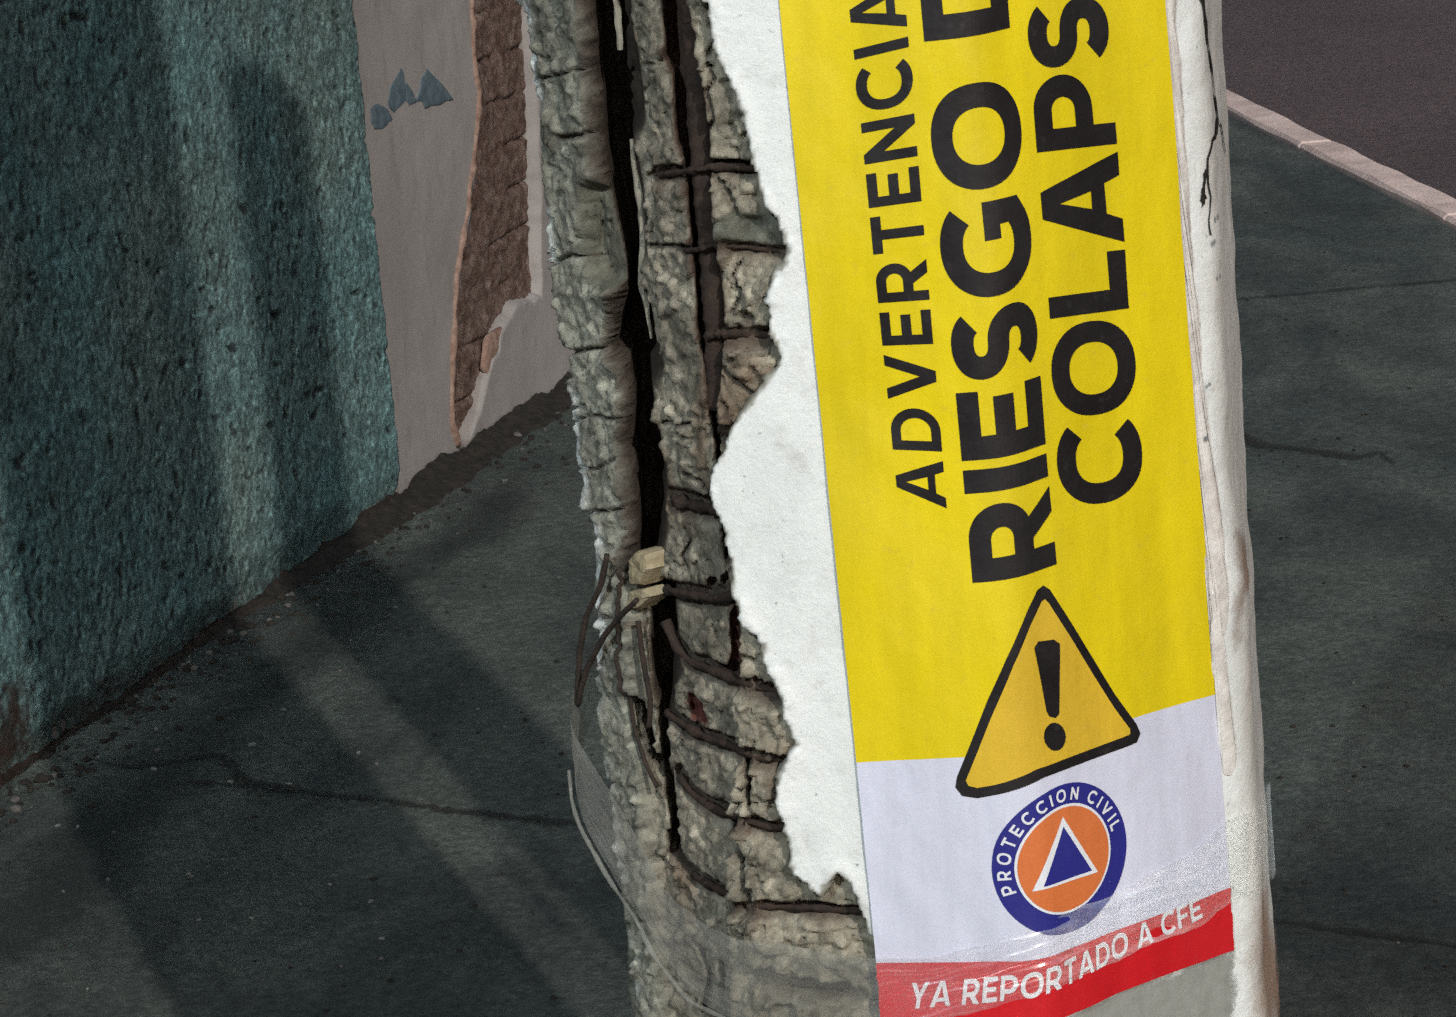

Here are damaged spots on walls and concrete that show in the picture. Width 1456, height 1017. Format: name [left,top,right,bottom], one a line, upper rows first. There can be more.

peeling [370,68,453,130]
crack [1200,0,1227,235]
spalling [450,0,879,1017]